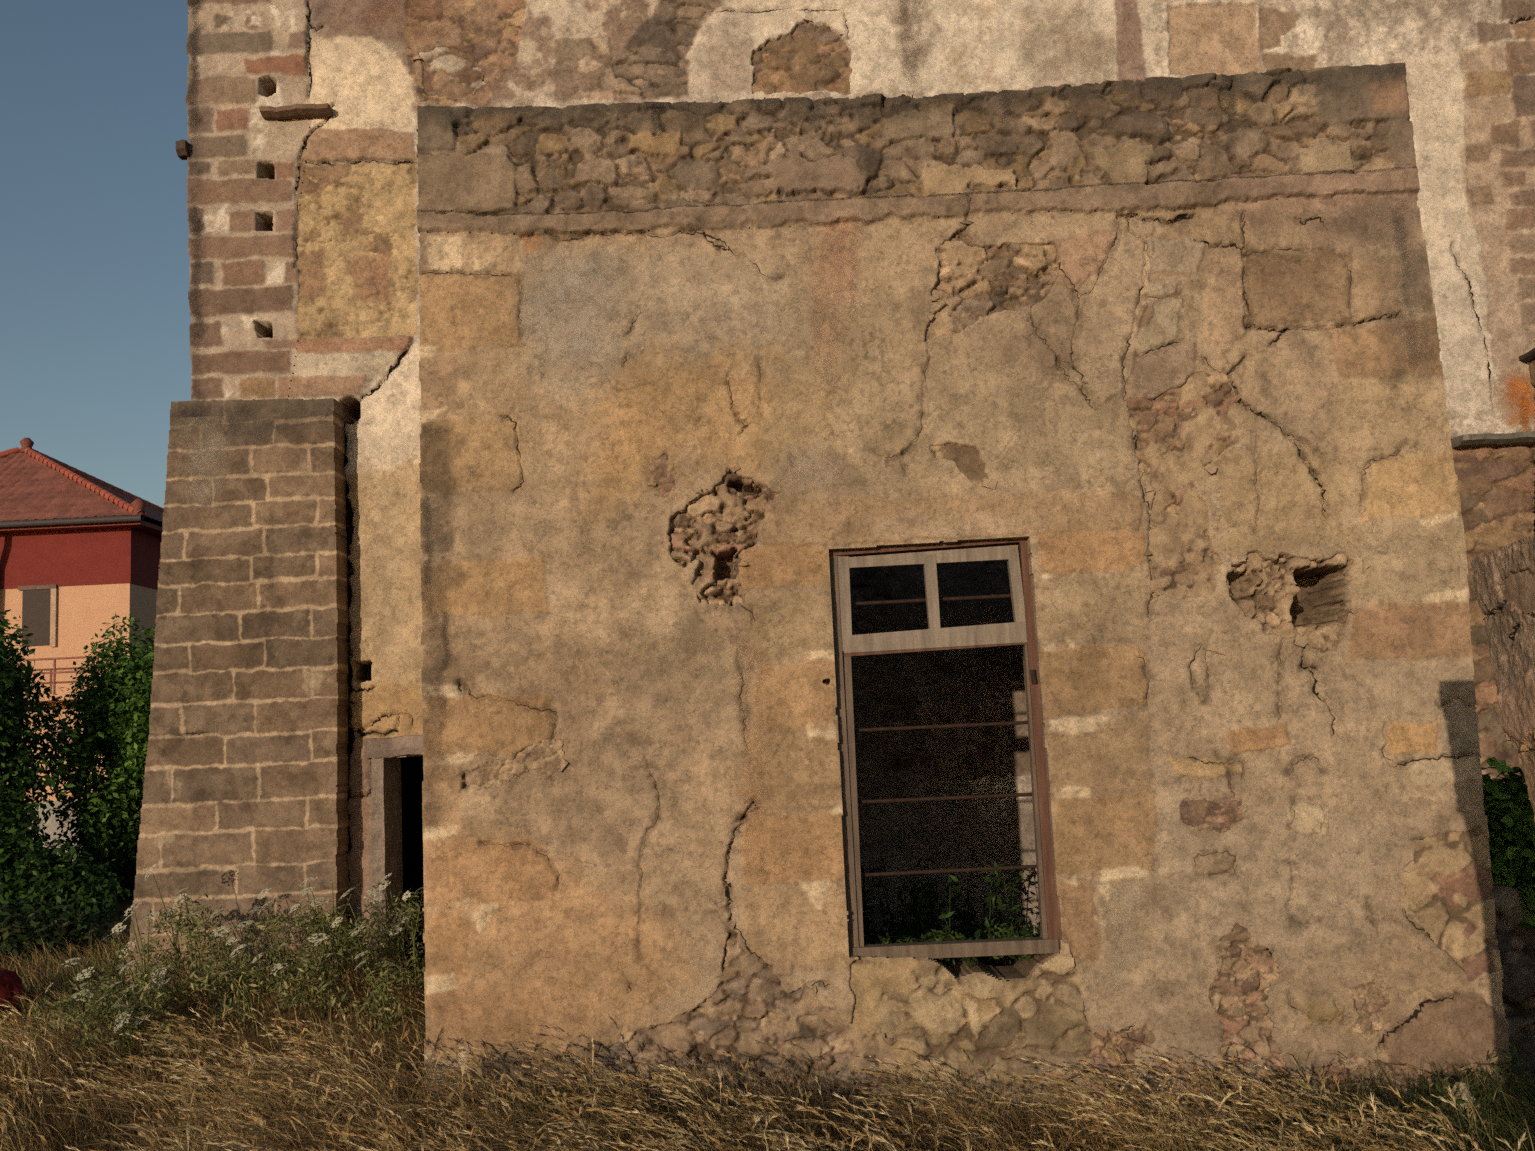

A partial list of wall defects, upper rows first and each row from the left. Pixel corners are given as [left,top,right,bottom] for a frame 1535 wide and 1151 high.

flaking render [752,16,852,95]
crack [295,1,415,267]
crack [527,229,780,278]
flaking render [925,221,1058,343]
crack [1031,213,1396,530]
crack [1453,254,1493,405]
spalling [647,454,779,609]
flaking render [1124,372,1371,652]
crack [723,802,761,958]
flaking render [538,920,1509,1147]
crack [1367,906,1466,1053]
flaking render [1401,827,1502,982]